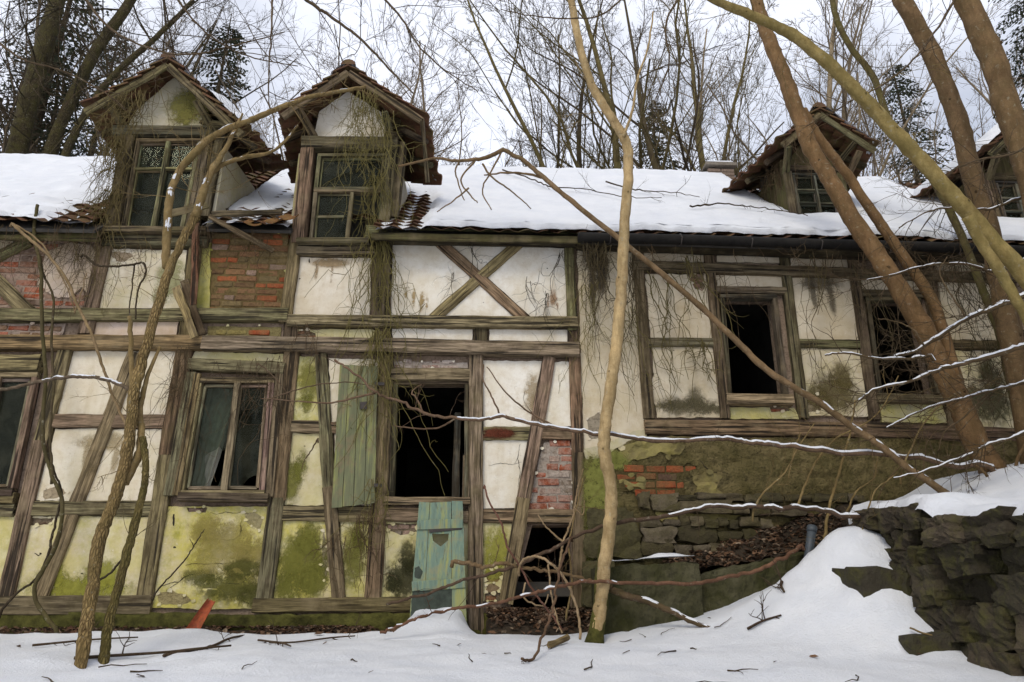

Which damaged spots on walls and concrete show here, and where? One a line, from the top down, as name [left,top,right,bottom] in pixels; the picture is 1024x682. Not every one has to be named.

spalling [0,241,97,308]
spalling [209,215,290,308]
damp [659,388,720,416]
damp [808,364,860,411]
damp [295,453,307,480]
damp [611,450,629,470]
spalling [529,411,723,509]
damp [84,561,119,588]
damp [184,569,214,584]
damp [227,560,260,607]
damp [275,523,328,598]